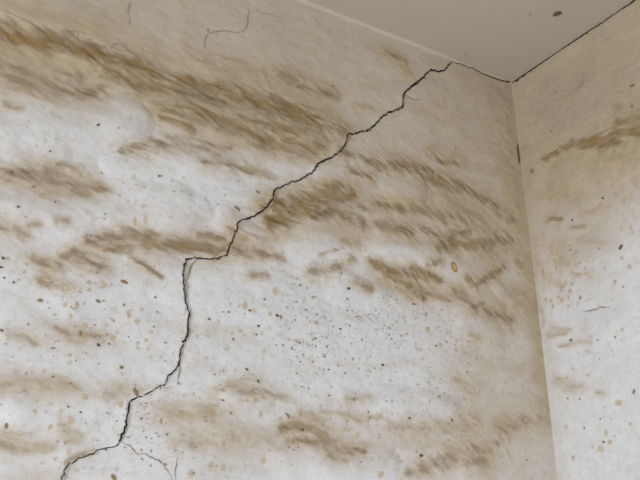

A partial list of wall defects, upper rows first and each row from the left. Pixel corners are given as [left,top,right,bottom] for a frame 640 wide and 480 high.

crack [204,10,281,50]
leakage [101,65,171,95]
leakage [158,115,196,134]
leakage [238,114,307,137]
leakage [219,163,270,178]
leakage [375,220,443,238]
crack [61,62,466,480]